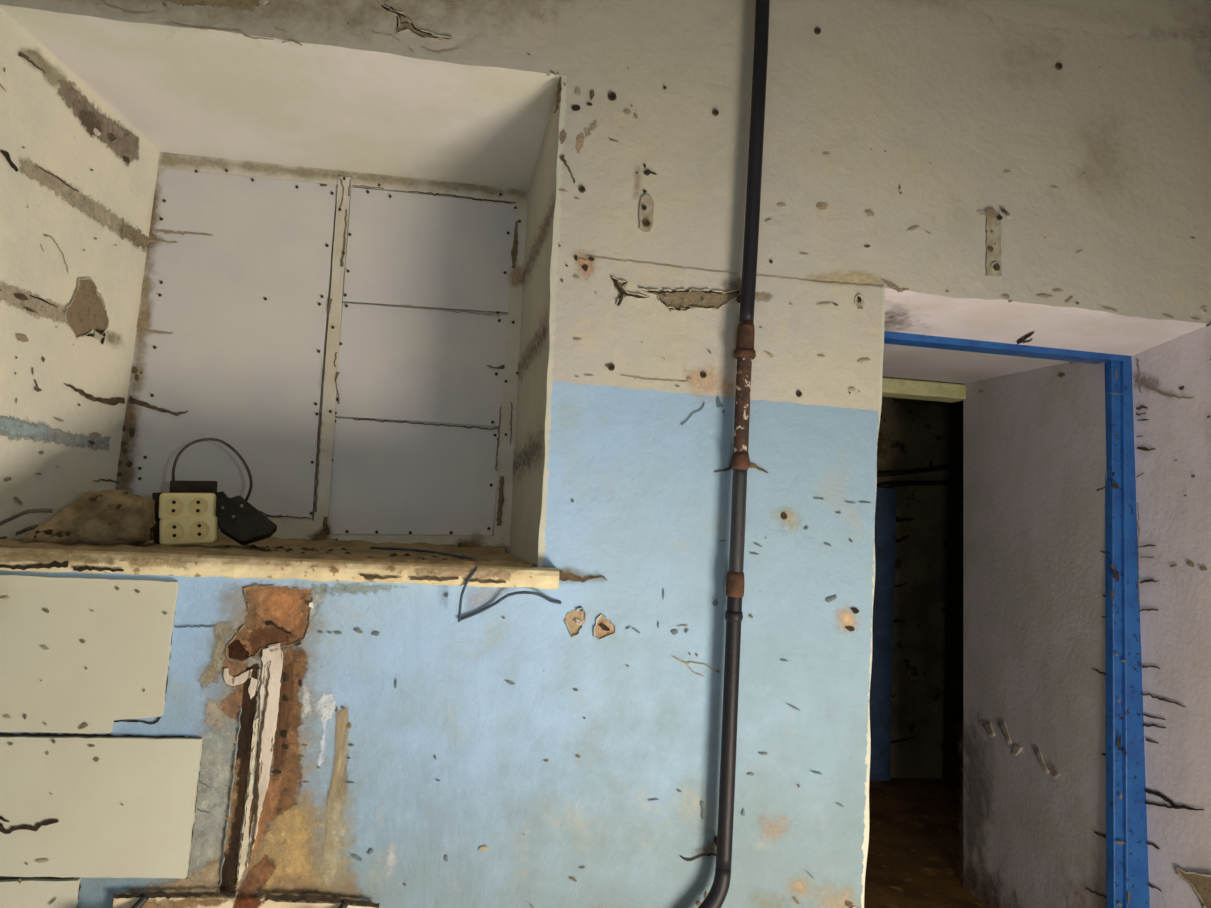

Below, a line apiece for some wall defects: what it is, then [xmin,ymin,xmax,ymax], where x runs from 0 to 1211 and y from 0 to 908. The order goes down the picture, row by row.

flaking render [163,0,270,12]
peeling [18,50,139,166]
peeling [0,146,149,251]
flaking render [611,276,741,312]
crack [1134,358,1194,612]
peeling [564,607,641,640]
crack [1141,665,1185,744]
crack [1144,789,1204,811]
flaking render [1174,867,1211,908]